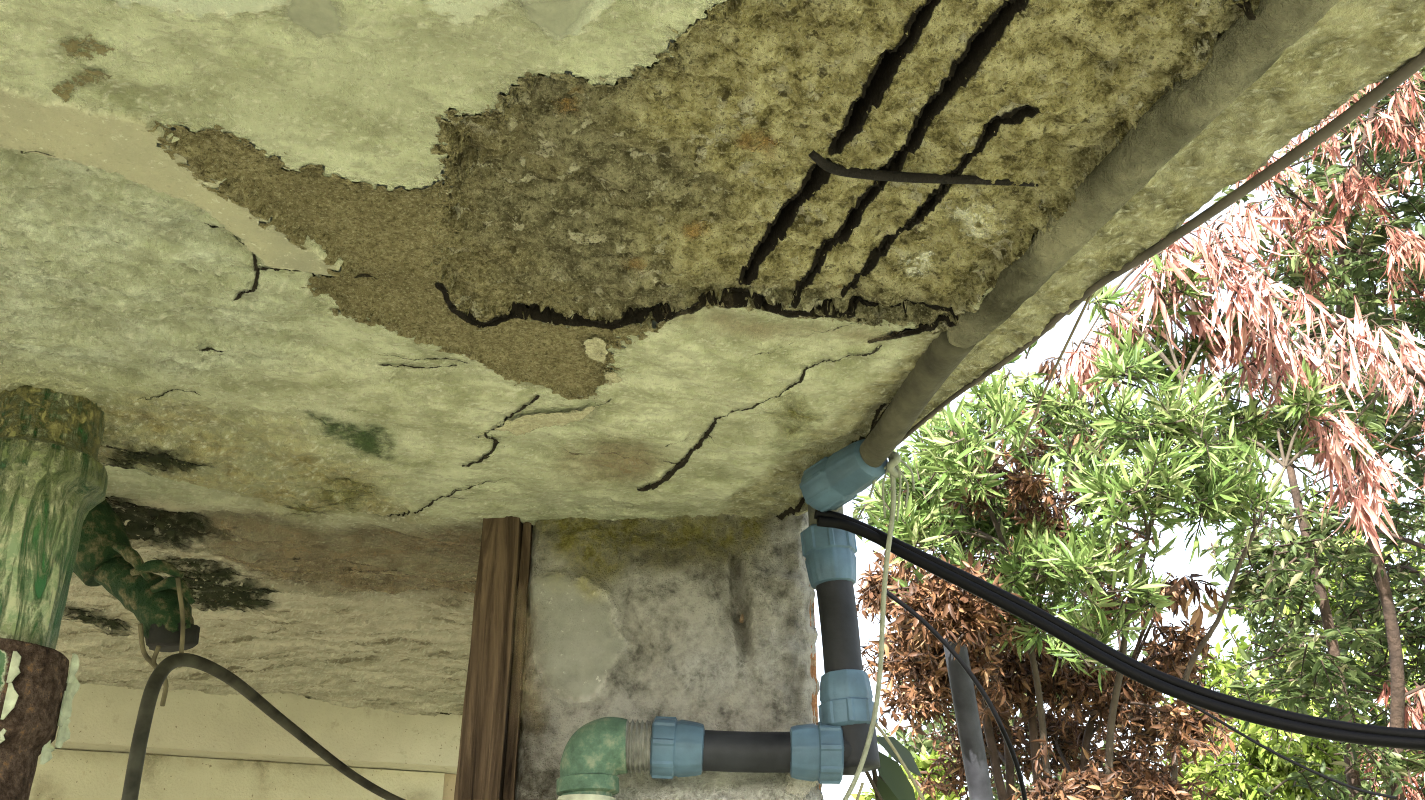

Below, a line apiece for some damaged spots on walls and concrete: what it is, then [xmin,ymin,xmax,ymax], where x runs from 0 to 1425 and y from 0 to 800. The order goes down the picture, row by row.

spalling [148,0,1261,436]
damp [102,446,207,473]
crack [388,395,540,517]
crack [637,318,882,491]
crack [776,497,805,520]
crack [849,403,890,445]